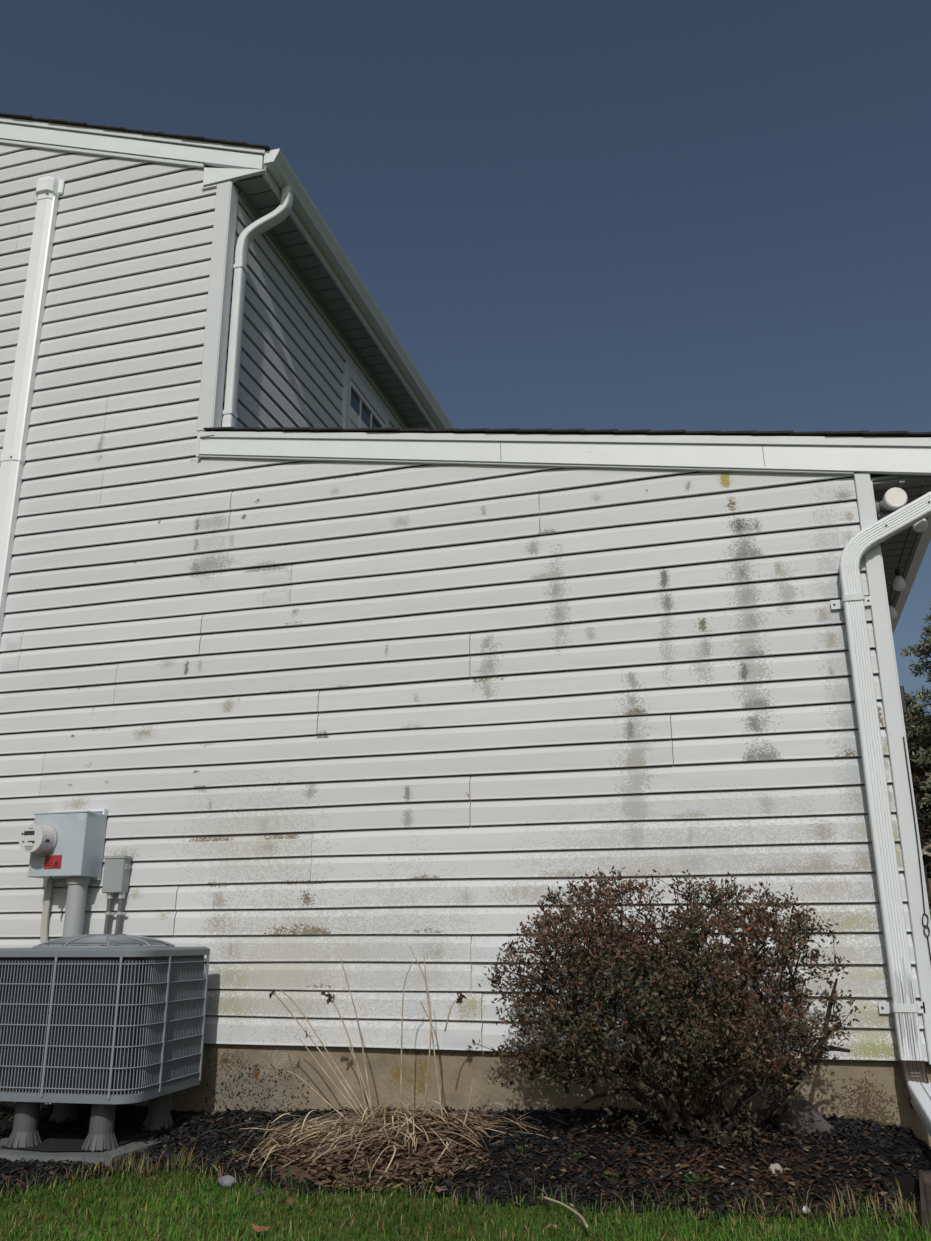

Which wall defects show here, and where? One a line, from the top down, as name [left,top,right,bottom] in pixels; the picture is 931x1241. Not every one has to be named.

water stain [188,513,302,625]
water stain [471,632,508,699]
water stain [524,529,598,656]
water stain [653,507,809,761]
water stain [828,666,858,735]
water stain [609,670,665,851]
water stain [622,811,712,878]